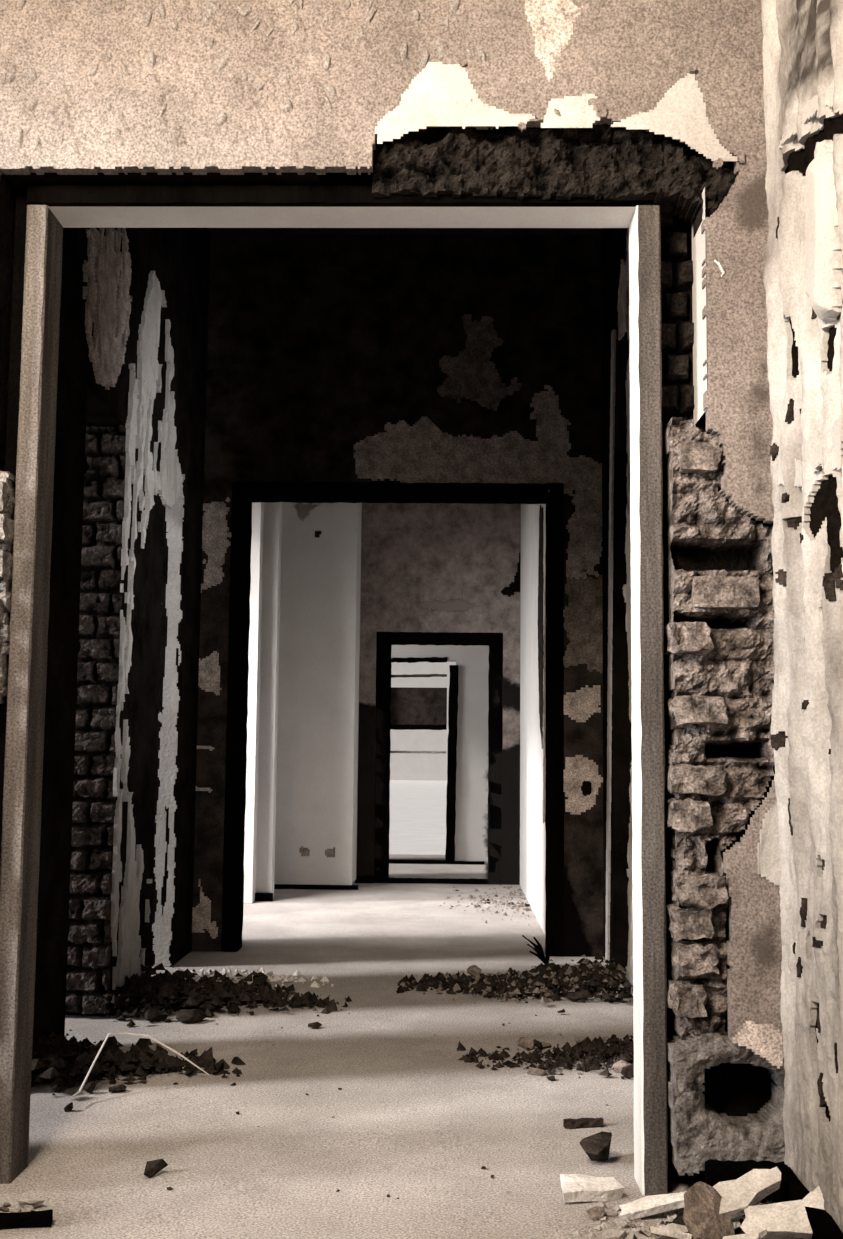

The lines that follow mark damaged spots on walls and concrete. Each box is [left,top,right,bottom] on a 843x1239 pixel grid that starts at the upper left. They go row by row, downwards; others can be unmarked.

flaking render [372,61,745,238]
flaking render [785,398,801,424]
flaking render [0,470,16,704]
flaking render [65,228,185,1014]
peeling [201,497,232,593]
peeling [354,228,632,961]
flaking render [822,562,843,601]
peeling [198,651,222,695]
flaking render [663,417,804,1176]
peeling [192,879,218,939]
flaking render [792,898,827,978]
flaking render [817,1043,838,1107]